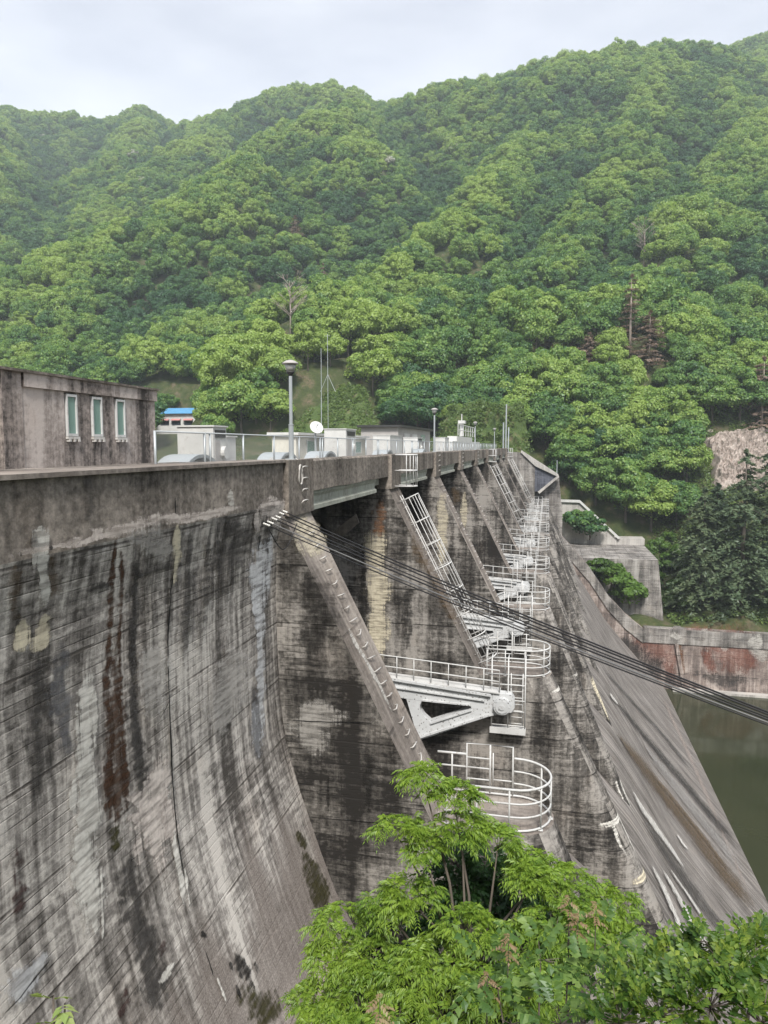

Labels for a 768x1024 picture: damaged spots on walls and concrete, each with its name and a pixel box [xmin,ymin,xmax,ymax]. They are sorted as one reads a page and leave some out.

rust [102,542,130,821]
damp [8,522,273,1008]
crack [162,573,185,881]
damp [295,702,344,755]